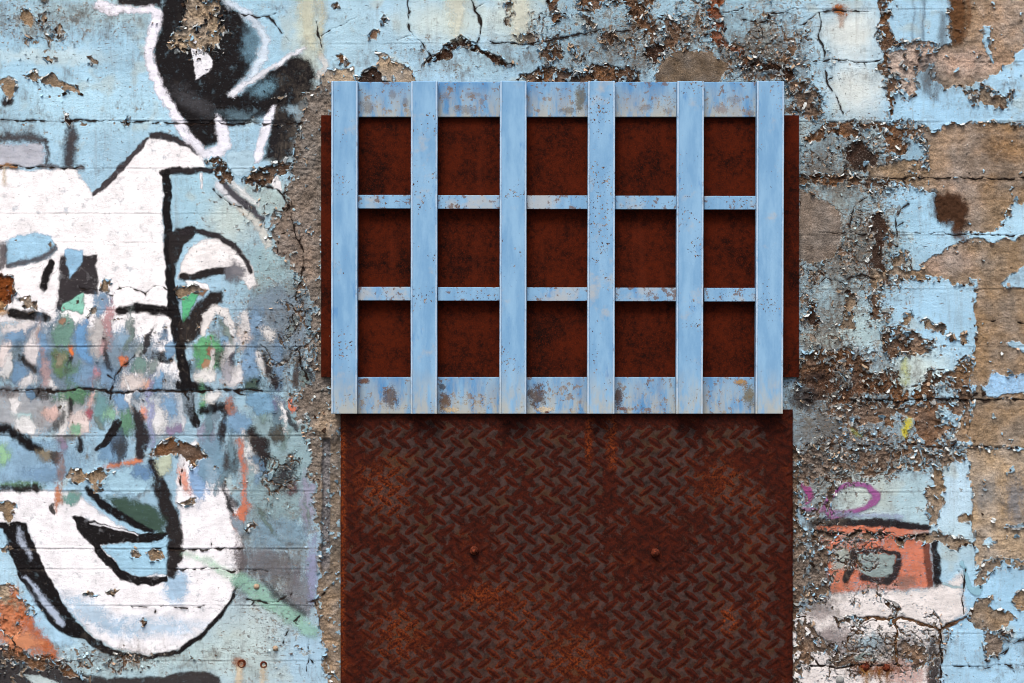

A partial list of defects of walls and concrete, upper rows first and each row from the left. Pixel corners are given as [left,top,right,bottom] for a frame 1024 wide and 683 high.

peeling [0,0,99,128]
peeling [166,0,232,71]
crack [406,0,431,56]
crack [723,7,881,114]
peeling [204,13,519,239]
peeling [502,0,1024,683]
corrosion [439,384,458,413]
corrosion [527,384,553,413]
corrosion [615,389,626,411]
corrosion [734,379,754,408]
peeling [144,435,219,471]
crack [804,569,1024,683]